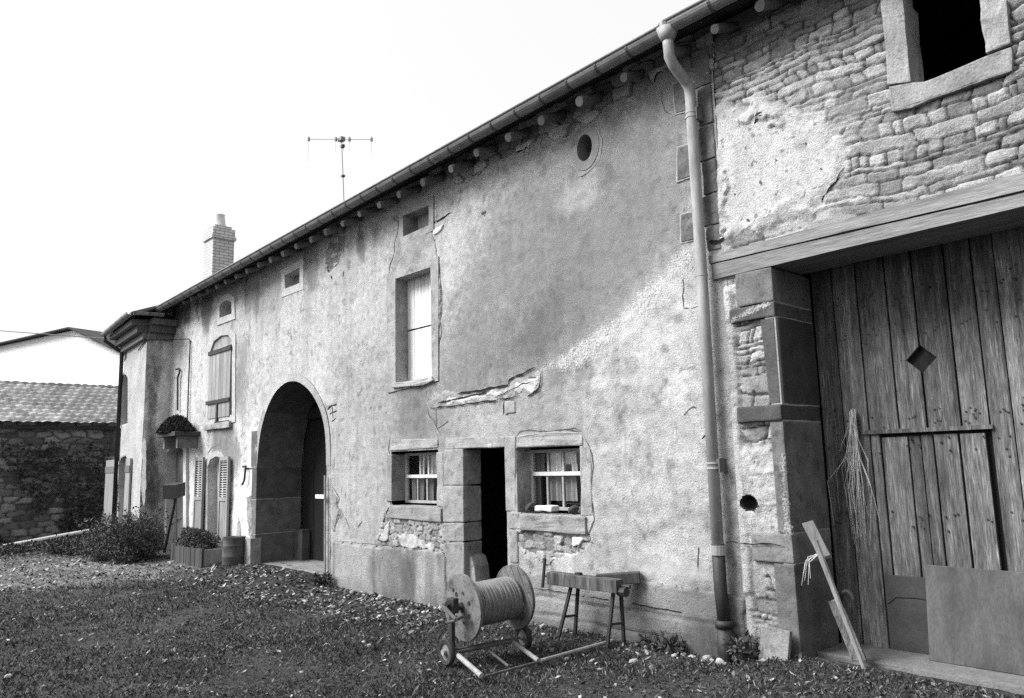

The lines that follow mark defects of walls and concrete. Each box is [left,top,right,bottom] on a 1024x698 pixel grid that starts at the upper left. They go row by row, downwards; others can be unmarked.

crack [433,212,452,235]
spalling [377,513,450,553]
spalling [516,529,592,564]